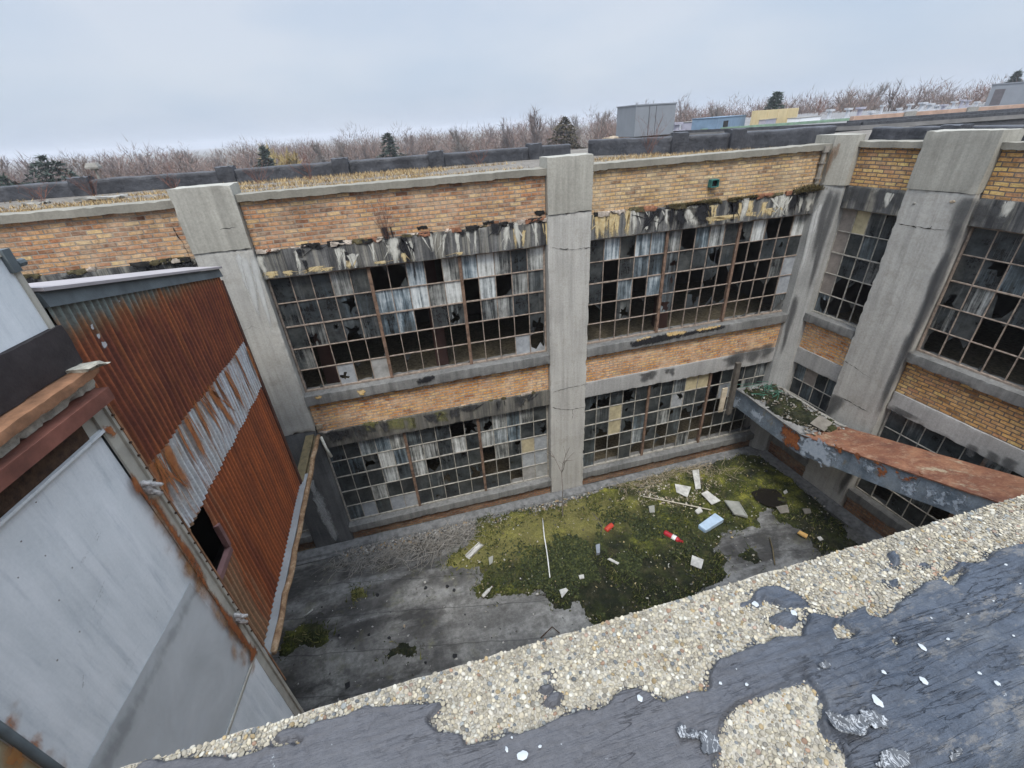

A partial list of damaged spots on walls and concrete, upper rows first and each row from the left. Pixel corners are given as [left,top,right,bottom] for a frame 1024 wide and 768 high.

damp [489,222,547,249]
damp [591,187,904,279]
damp [237,227,476,321]
peeling [733,397,763,422]
rust [781,421,800,450]
peeling [797,436,836,468]
rust [103,346,286,681]
peeling [901,482,967,514]
peeling [677,680,889,768]
peeling [875,747,910,768]